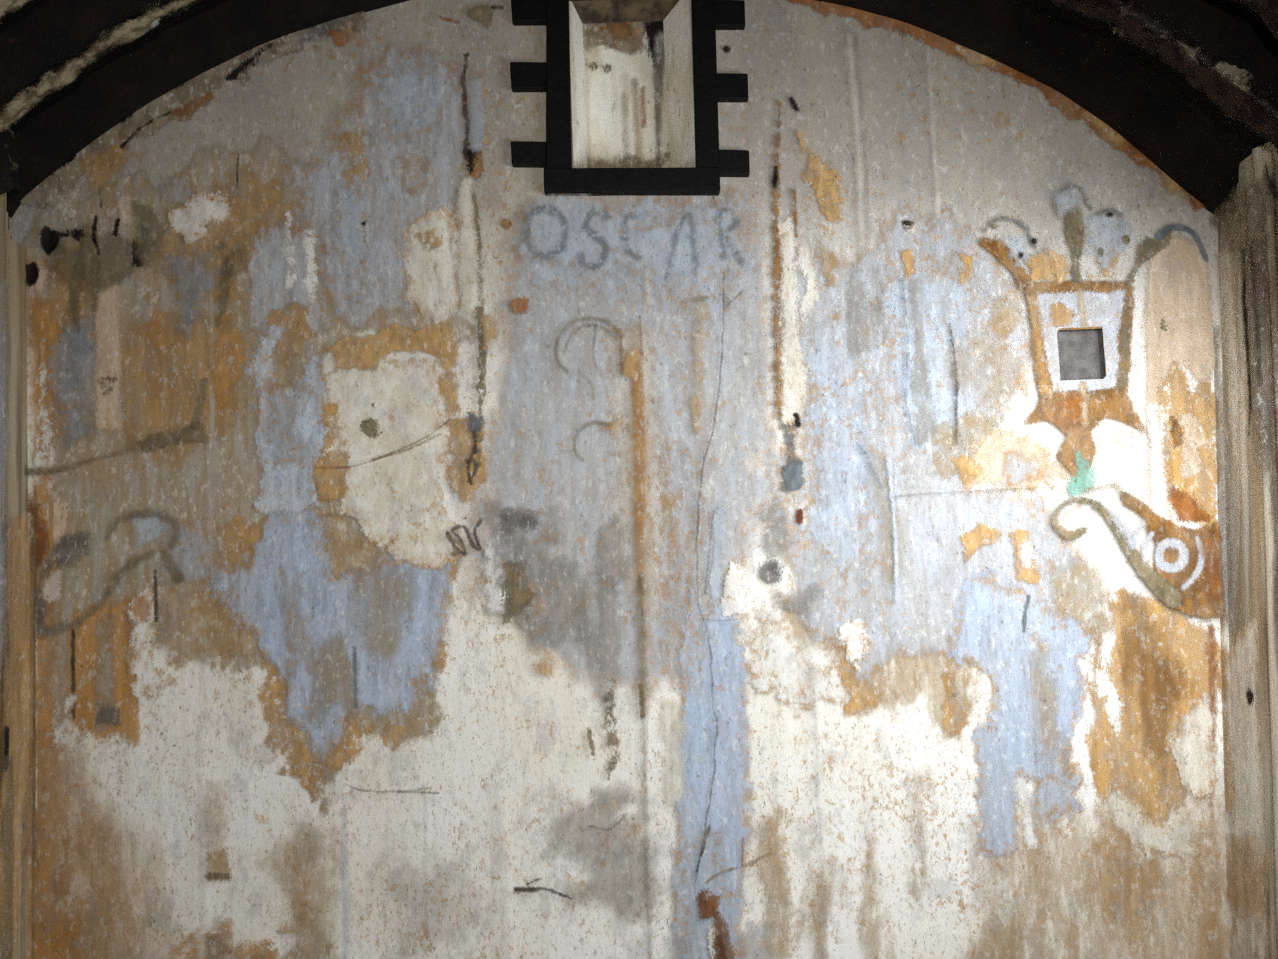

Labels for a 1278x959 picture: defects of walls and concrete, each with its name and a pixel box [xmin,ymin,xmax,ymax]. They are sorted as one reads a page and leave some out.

spalling [440,4,503,29]
spalling [583,21,649,73]
spalling [788,0,1206,211]
peeling [0,11,499,959]
damp [482,503,627,701]
rust [602,317,645,615]
peeling [471,131,1268,959]
crack [696,640,772,882]
rust [695,888,735,959]
damp [974,798,1231,959]